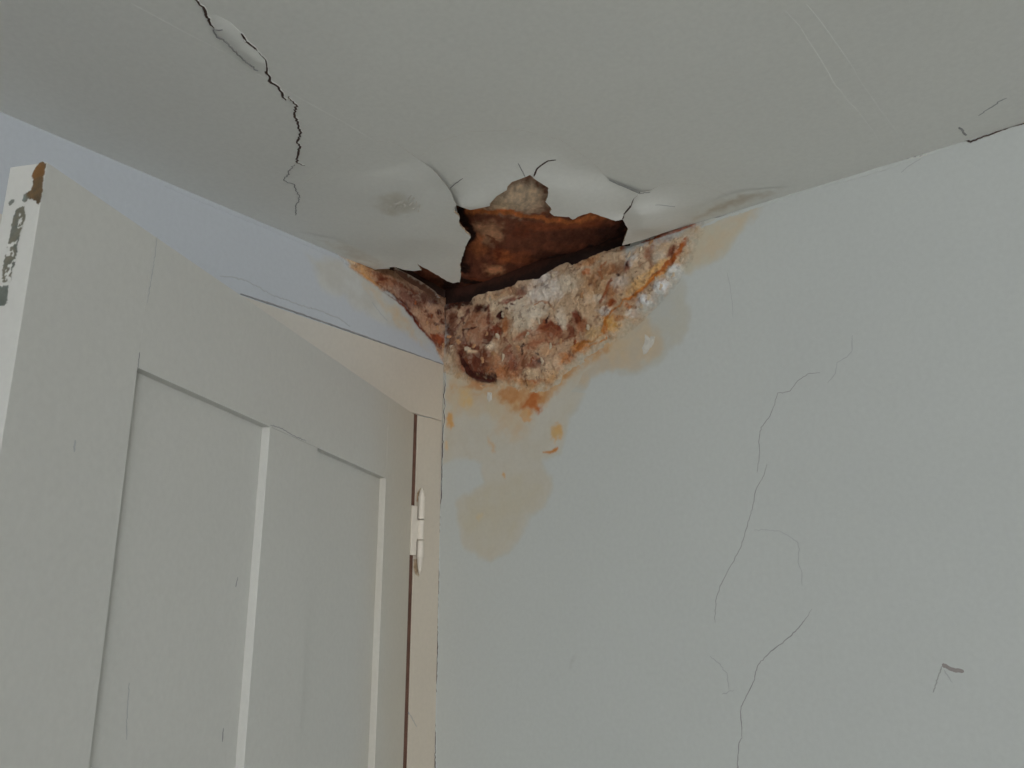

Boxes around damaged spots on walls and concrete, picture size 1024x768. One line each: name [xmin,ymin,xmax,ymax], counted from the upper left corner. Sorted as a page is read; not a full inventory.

crack [195,0,305,215]
spalling [0,161,47,306]
flaking render [336,175,706,393]
water stain [296,187,789,565]
crack [714,335,853,619]
crack [710,609,812,768]